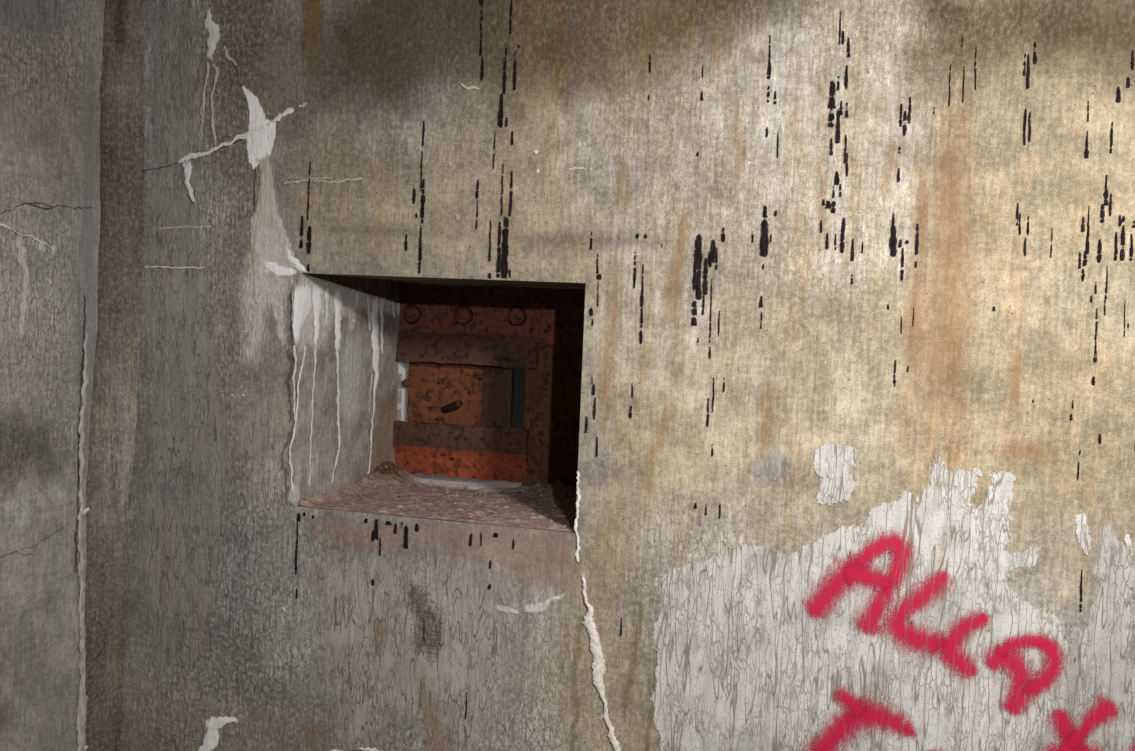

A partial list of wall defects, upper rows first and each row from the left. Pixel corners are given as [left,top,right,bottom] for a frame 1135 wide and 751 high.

crack [1,202,93,214]
crack [142,102,307,203]
damp [199,9,400,574]
damp [339,0,756,279]
damp [691,227,725,359]
damp [889,212,919,280]
damp [899,97,912,154]
crack [75,296,89,751]
peeling [812,442,859,506]
crack [574,471,621,751]
peeling [650,456,1135,751]
spalling [198,716,237,751]